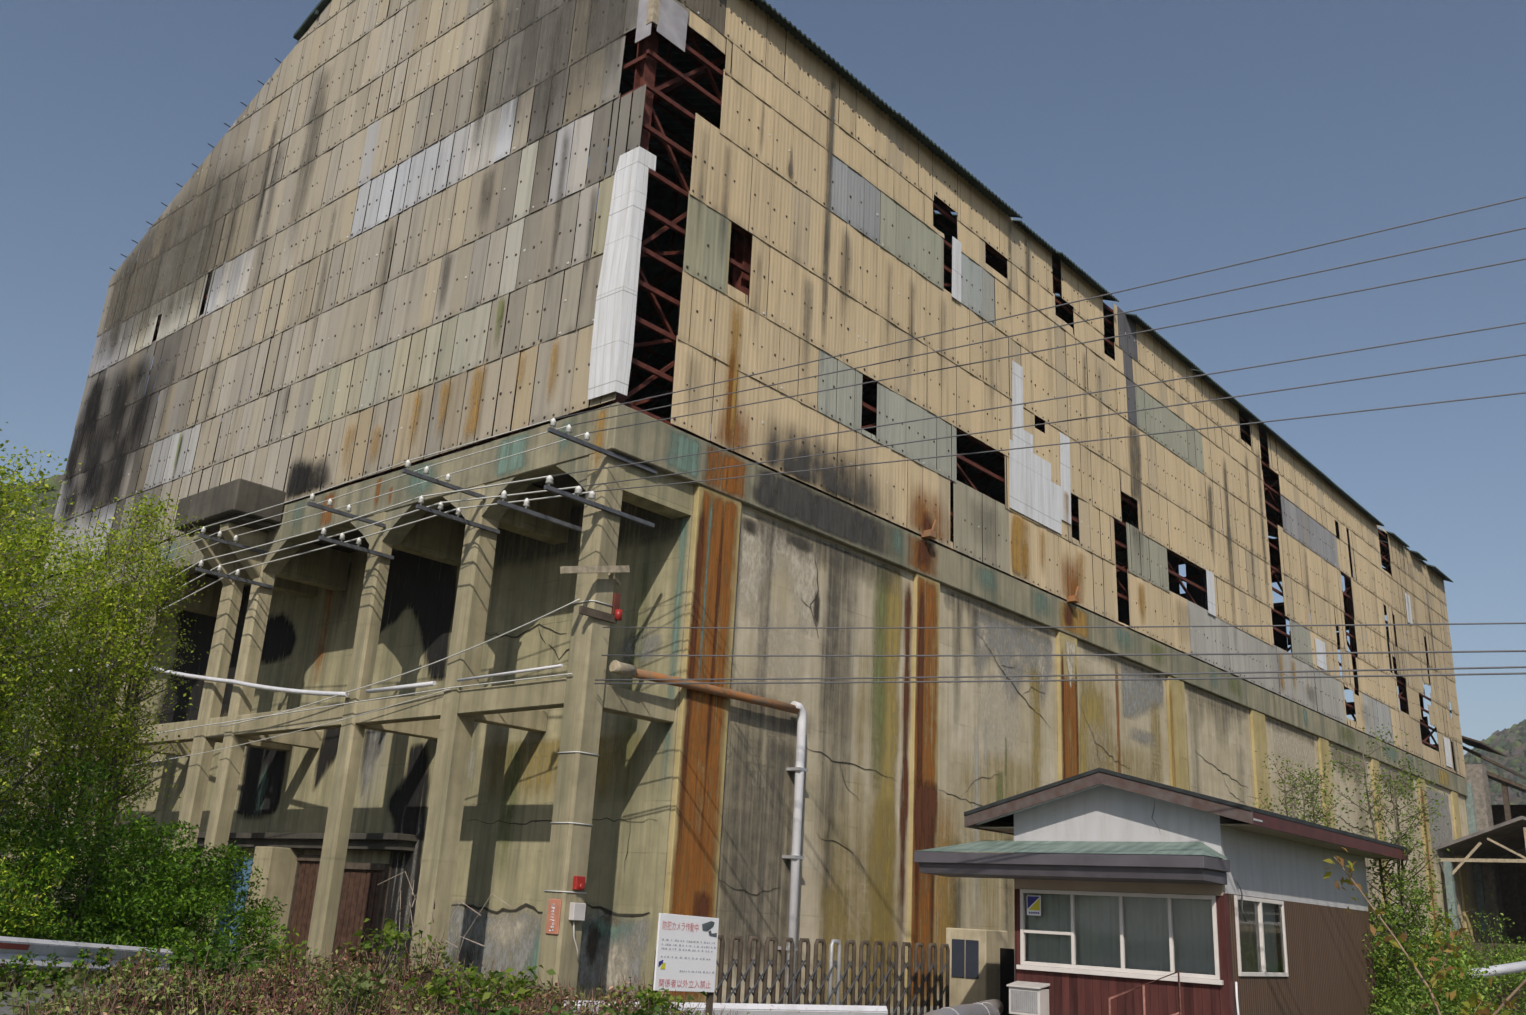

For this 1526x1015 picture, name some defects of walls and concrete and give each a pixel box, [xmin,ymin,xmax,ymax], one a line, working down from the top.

water stain [62,363,148,521]
water stain [286,461,327,519]
rust [671,308,746,918]
water stain [754,432,900,746]
rust [1012,514,1044,576]
rust [1061,555,1087,638]
rust [870,494,955,998]
rust [1062,656,1121,779]
peeling [444,905,541,987]
peeling [576,910,648,1001]
rust [669,991,702,999]